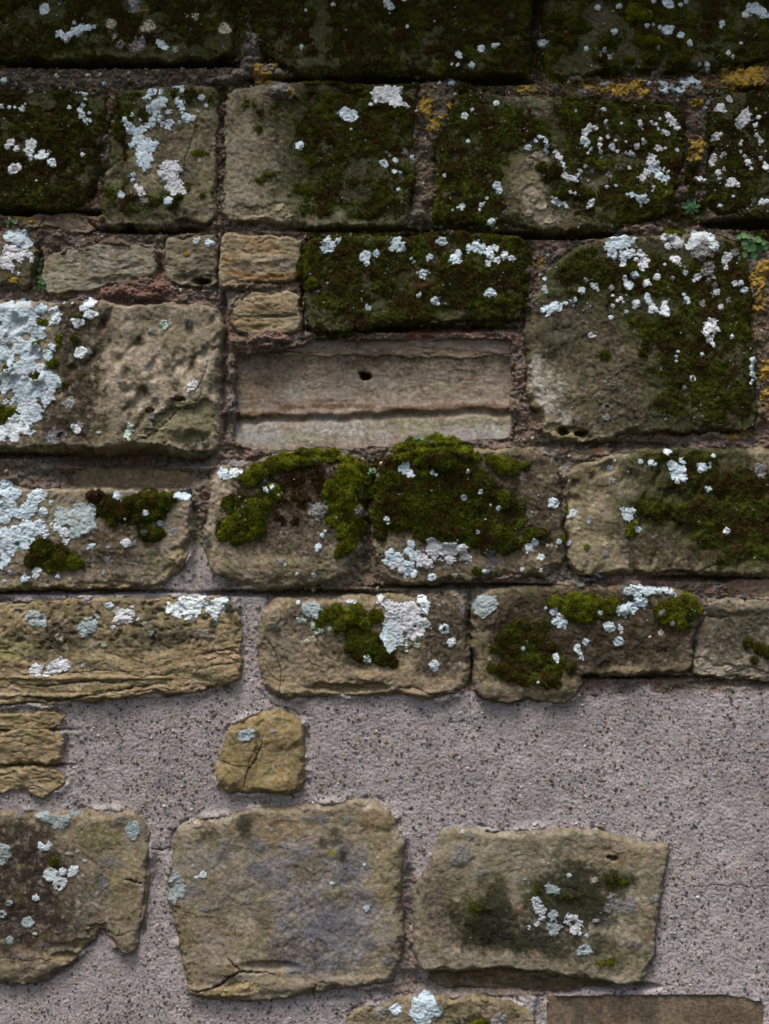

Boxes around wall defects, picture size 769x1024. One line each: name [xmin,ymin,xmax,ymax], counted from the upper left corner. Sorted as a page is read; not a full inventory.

crack [219,735,266,794]
crack [187,958,276,993]